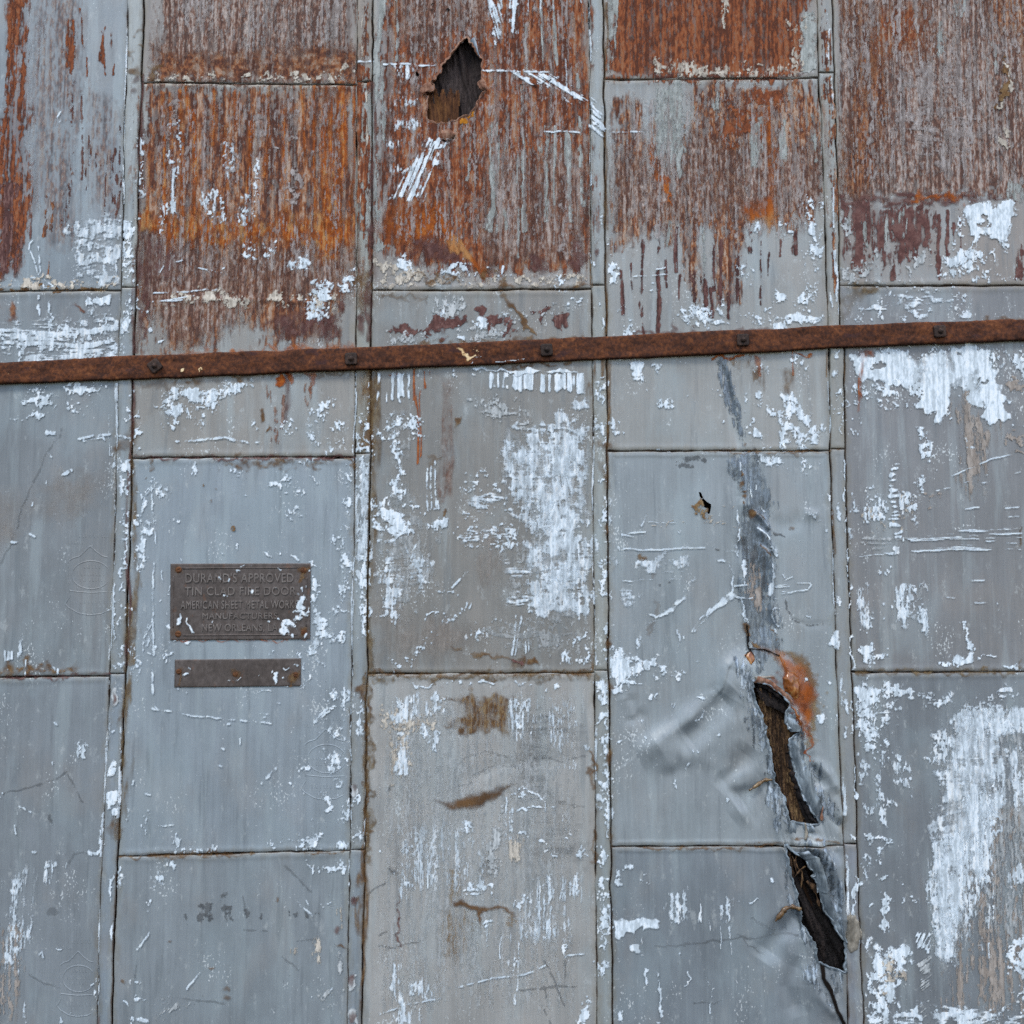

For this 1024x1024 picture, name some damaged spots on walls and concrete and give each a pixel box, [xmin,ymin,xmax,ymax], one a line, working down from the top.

rust [0,0,122,318]
peeling [358,0,606,342]
rust [129,0,1024,355]
rust [594,359,610,446]
peeling [618,359,662,381]
peeling [718,343,1024,497]
peeling [153,833,218,887]
rust [353,613,512,942]
peeling [261,367,730,979]
rust [514,657,594,680]
rust [772,652,817,757]
peeling [816,460,1024,1024]